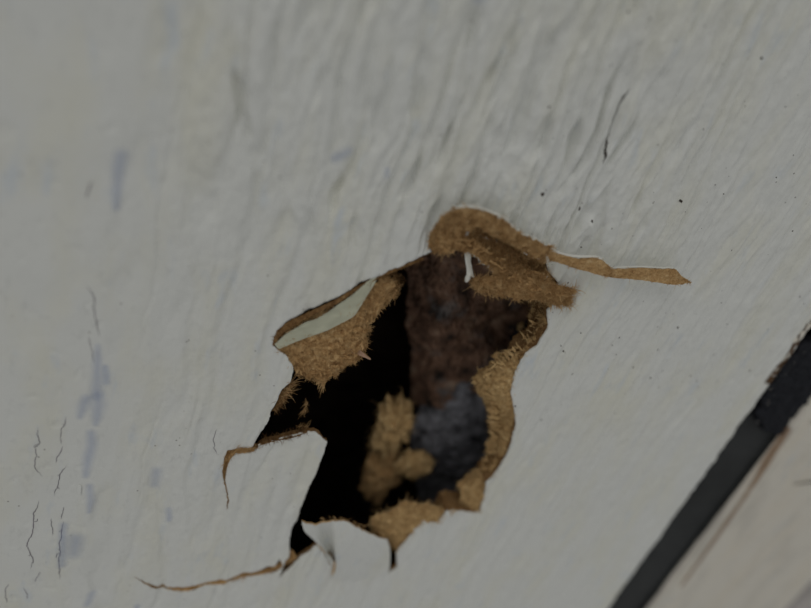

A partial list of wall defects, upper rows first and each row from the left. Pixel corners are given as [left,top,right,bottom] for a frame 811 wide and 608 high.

peeling [427,200,692,314]
spalling [255,262,424,581]